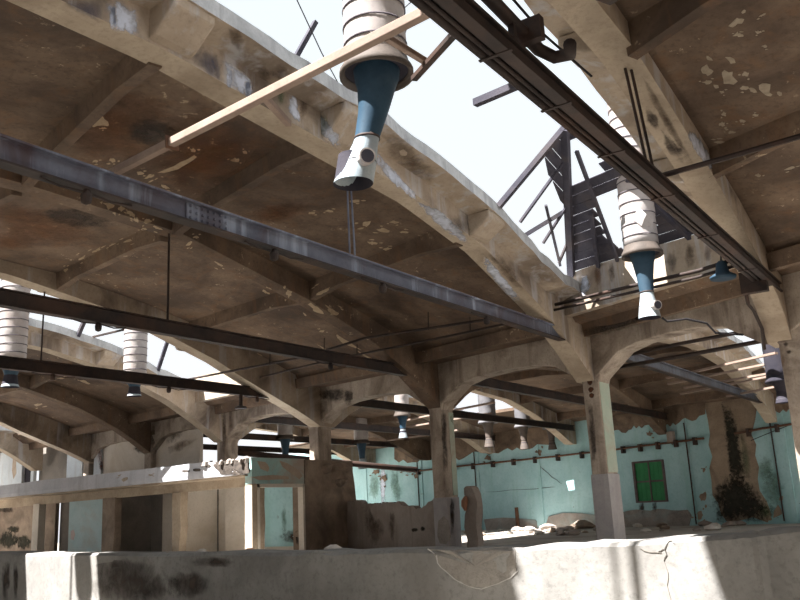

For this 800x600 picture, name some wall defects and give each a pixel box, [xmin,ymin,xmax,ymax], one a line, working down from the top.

peeling [729,10,746,37]
peeling [699,56,782,97]
leakage [648,95,681,154]
peeling [137,147,200,191]
leakage [689,134,712,168]
leakage [320,390,352,417]
peeling [773,394,789,413]
peeling [612,413,655,438]
flaking render [623,398,783,527]
leakage [0,526,30,549]
leakage [98,560,163,600]
crack [640,540,674,599]